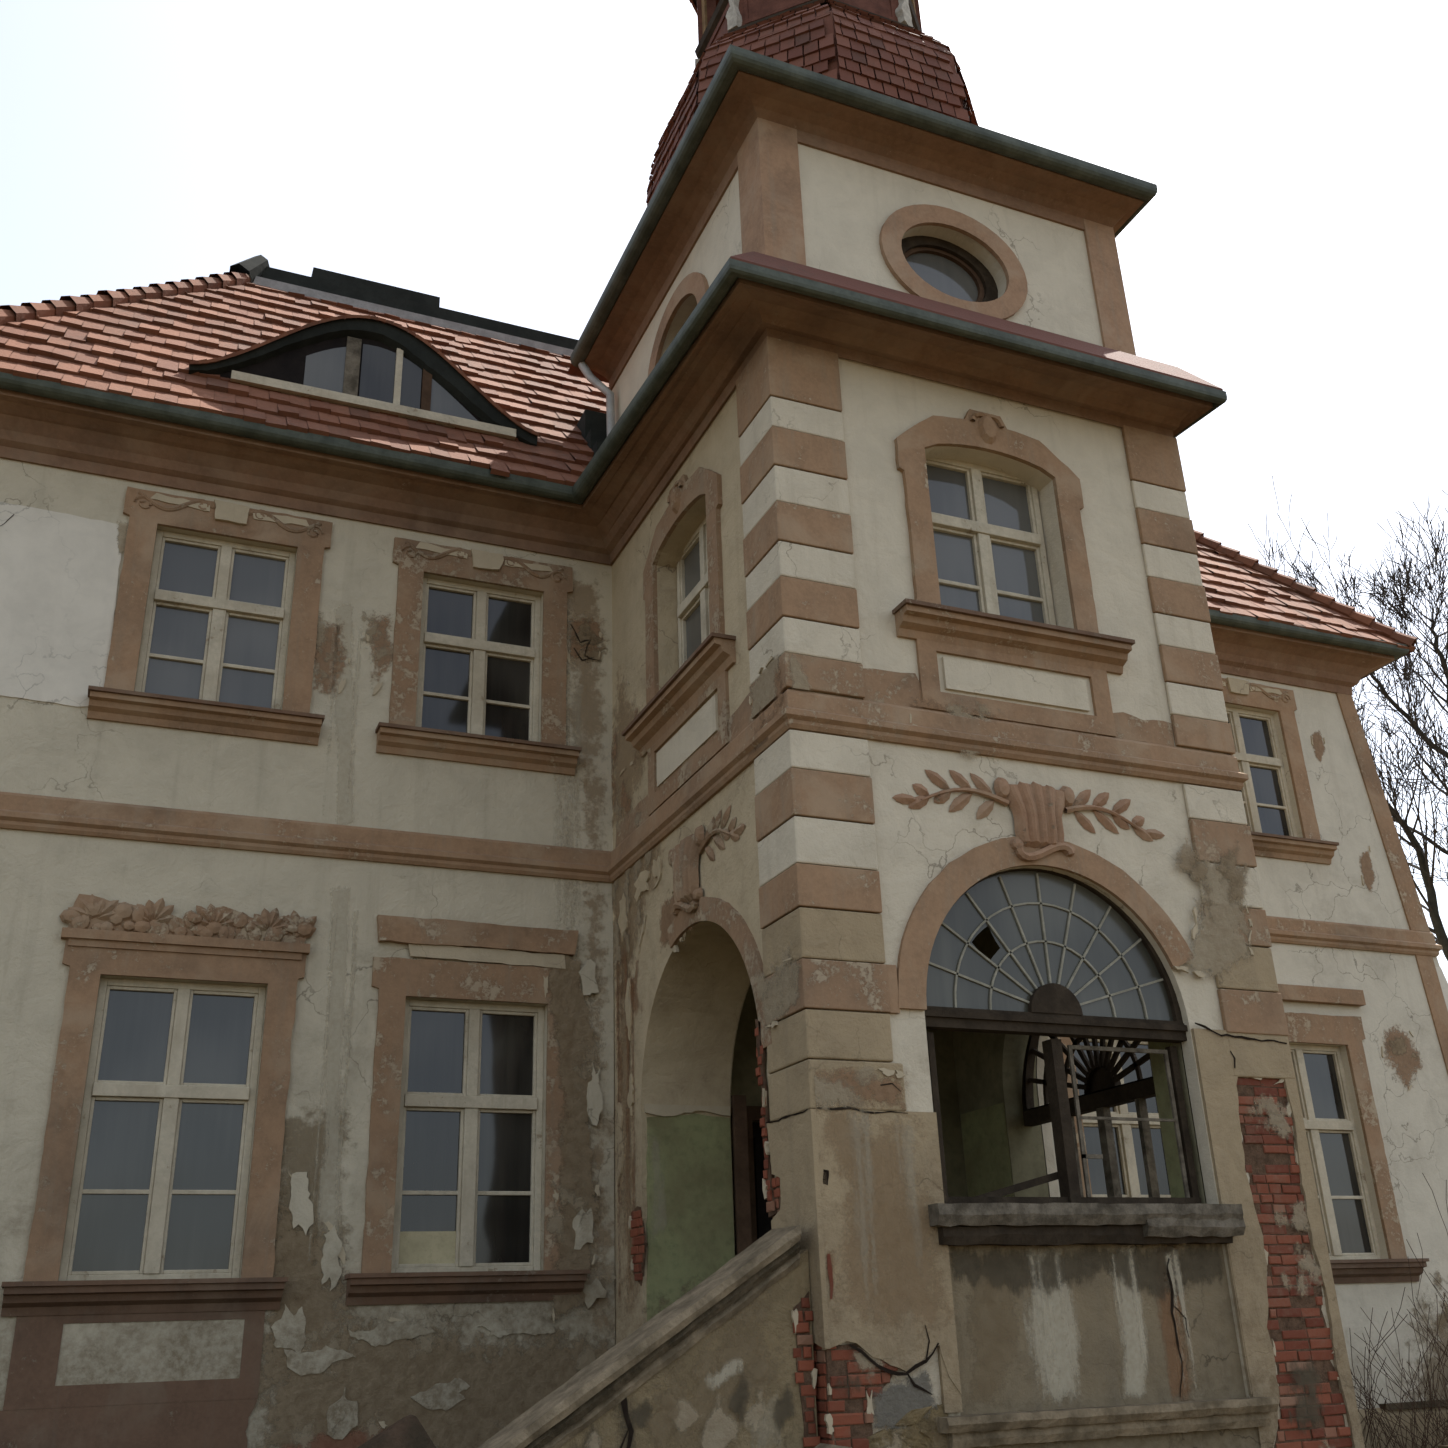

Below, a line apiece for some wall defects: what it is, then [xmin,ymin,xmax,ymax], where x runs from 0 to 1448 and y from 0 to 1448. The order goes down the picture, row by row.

peeling [314,617,351,694]
peeling [362,612,393,696]
peeling [1311,731,1325,762]
flaking render [1172,840,1254,978]
peeling [1359,846,1375,890]
peeling [755,950,801,1219]
peeling [1381,1026,1423,1091]
flaking render [258,953,647,1448]
flaking render [1236,1077,1353,1448]
flaking render [791,1291,898,1448]
crack [849,1325,939,1395]
crack [620,1397,634,1448]